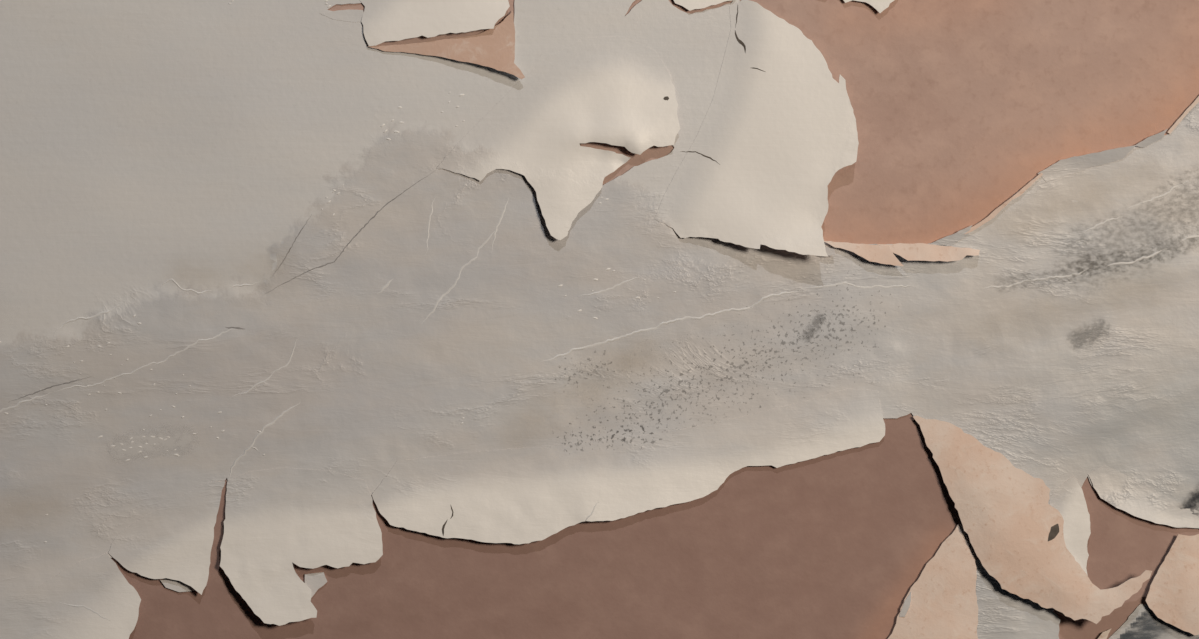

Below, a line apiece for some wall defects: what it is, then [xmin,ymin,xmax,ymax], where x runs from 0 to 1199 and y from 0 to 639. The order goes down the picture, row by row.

peeling [320,0,1199,266]
crack [158,170,436,294]
crack [422,197,509,323]
crack [985,235,1199,289]
crack [1082,179,1192,233]
crack [541,282,916,362]
crack [0,327,244,413]
peeling [0,389,1199,639]
water stain [1183,492,1199,514]
water stain [1118,614,1164,639]